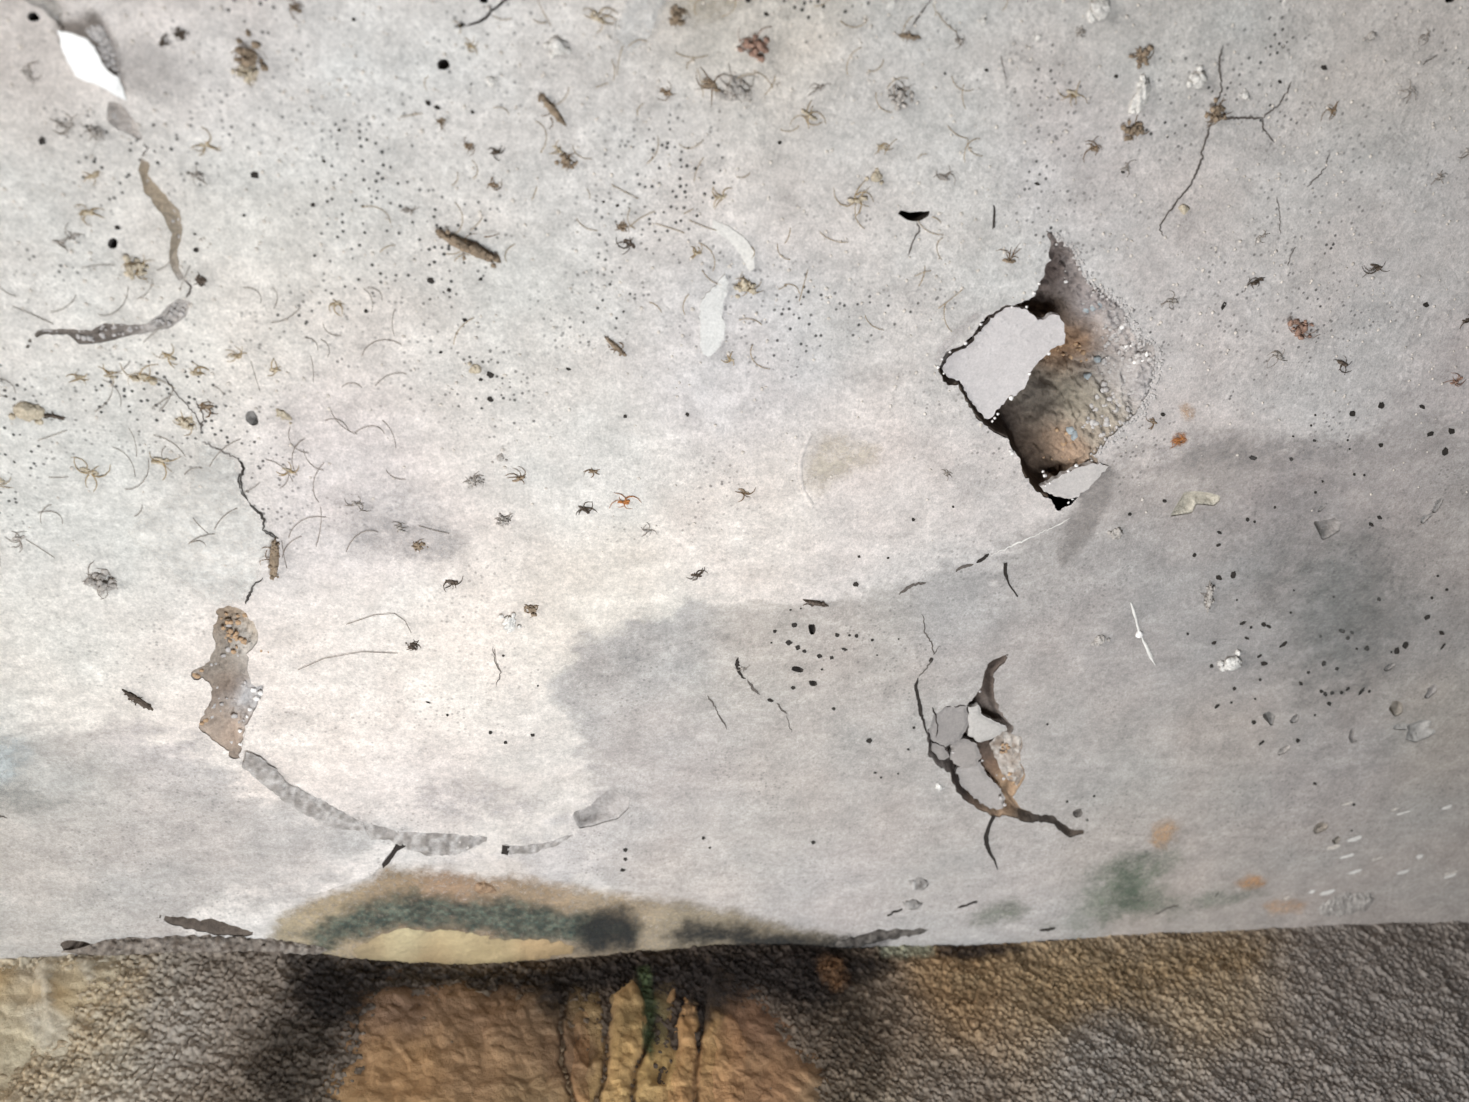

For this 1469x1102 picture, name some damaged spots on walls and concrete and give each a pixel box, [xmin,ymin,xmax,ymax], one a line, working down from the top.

crack [26,0,64,30]
crack [26,102,192,348]
crack [1159,48,1292,235]
spalling [936,229,1164,504]
peeling [153,606,630,900]
crack [899,519,1084,870]
water stain [250,869,891,1102]